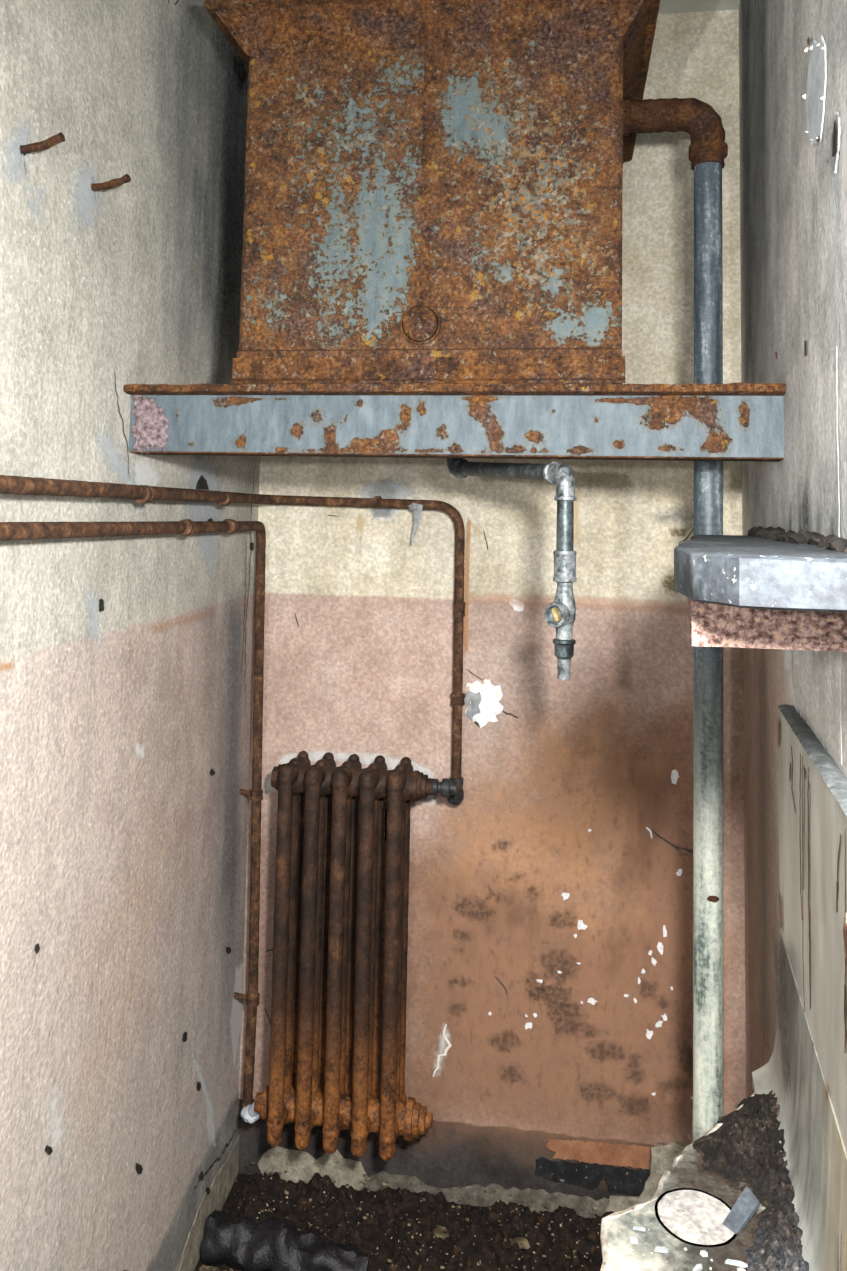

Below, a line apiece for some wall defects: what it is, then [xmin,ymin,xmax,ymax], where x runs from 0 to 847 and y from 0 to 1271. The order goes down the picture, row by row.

peeling [802,35,847,246]
peeling [131,395,169,486]
spalling [464,669,518,728]
leakage [433,1024,452,1077]